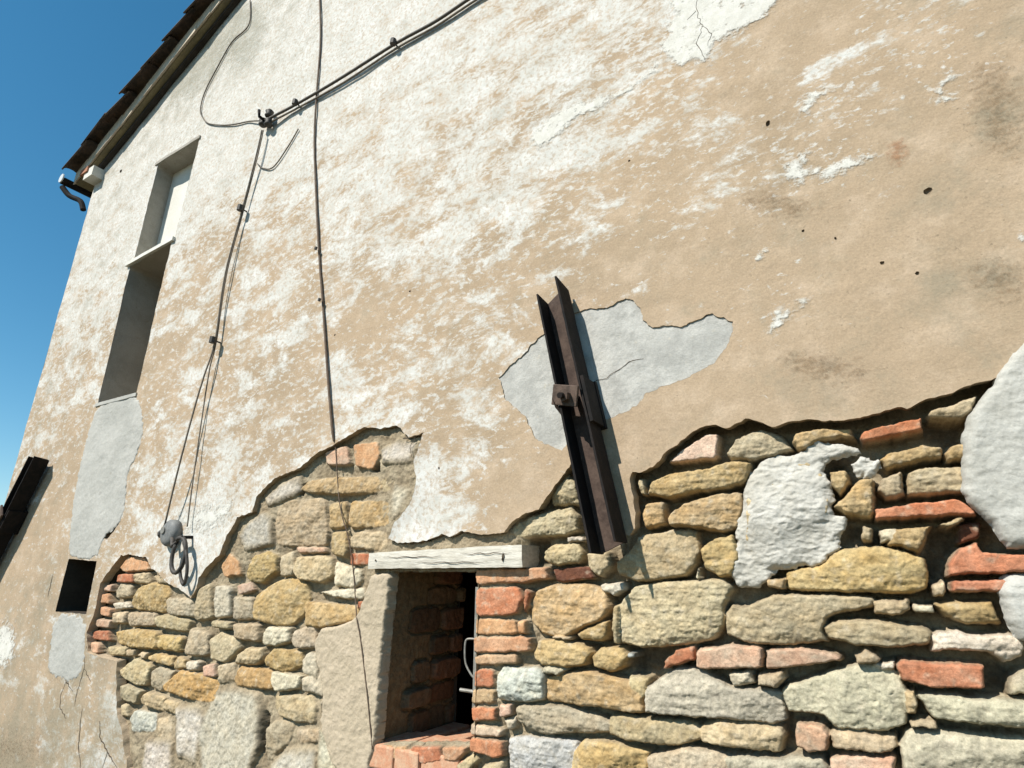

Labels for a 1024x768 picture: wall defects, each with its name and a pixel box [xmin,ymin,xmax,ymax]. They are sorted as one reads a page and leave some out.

peeling [659,0,776,65]
peeling [499,334,567,450]
peeling [574,298,733,419]
spalling [86,378,1024,768]
crack [60,646,117,768]